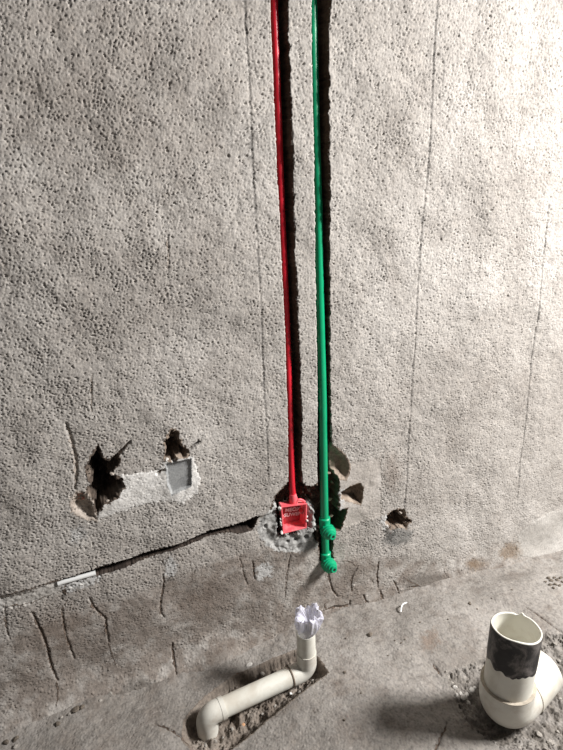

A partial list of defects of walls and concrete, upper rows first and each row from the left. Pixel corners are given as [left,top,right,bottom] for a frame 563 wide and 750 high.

spalling [69,441,129,523]
spalling [163,428,198,463]
spalling [270,438,364,561]
spalling [385,508,412,531]
crack [0,516,260,705]
crack [325,560,419,610]